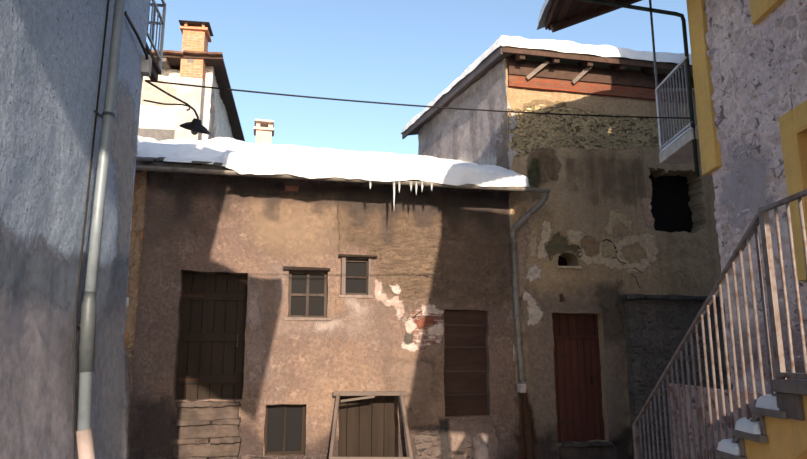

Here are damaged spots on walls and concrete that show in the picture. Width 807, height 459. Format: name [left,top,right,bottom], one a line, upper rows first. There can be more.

water stain [527,148,561,202]
flaking render [495,99,687,169]
water stain [0,223,88,459]
water stain [91,81,180,459]
spalling [374,279,444,353]
spalling [523,196,659,326]